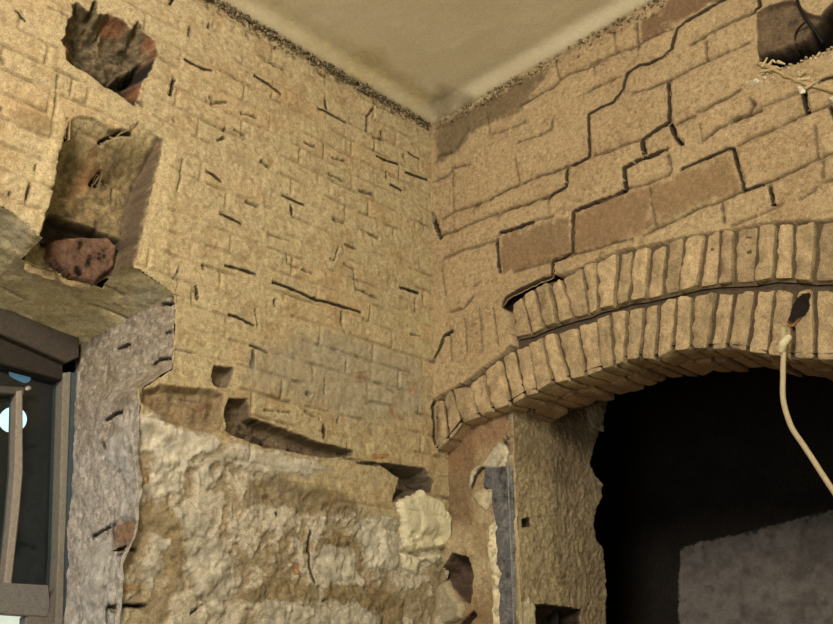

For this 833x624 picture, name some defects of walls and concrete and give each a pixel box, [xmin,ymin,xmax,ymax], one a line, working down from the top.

spalling [59,0,159,107]
spalling [203,0,669,130]
leakage [438,72,544,160]
crack [550,0,727,198]
crack [754,0,763,14]
spalling [746,0,833,85]
crack [801,75,833,120]
crack [432,212,444,238]
crack [495,82,777,308]
peeling [102,412,330,520]
peeling [315,454,479,624]
peeling [487,519,502,624]